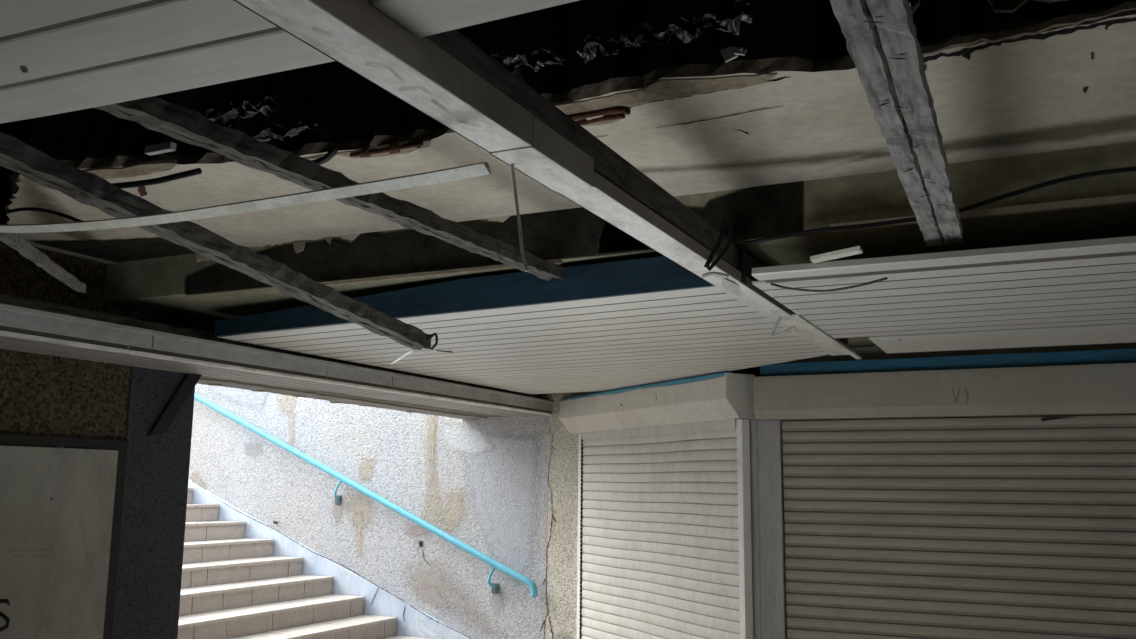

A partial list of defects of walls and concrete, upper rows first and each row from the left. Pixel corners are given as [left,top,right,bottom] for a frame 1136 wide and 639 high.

crack [213,496,471,639]
crack [540,427,556,639]